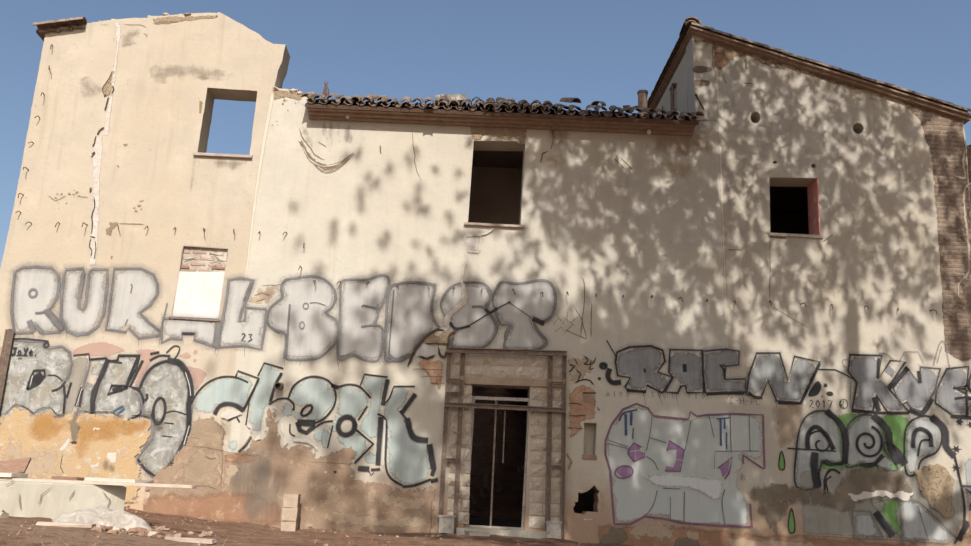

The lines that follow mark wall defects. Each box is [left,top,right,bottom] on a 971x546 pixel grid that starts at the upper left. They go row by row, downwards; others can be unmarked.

crack [89,24,121,265]
crack [435,228,494,336]
flaking render [408,329,459,388]
flaking render [568,355,600,437]
peeling [0,404,437,533]